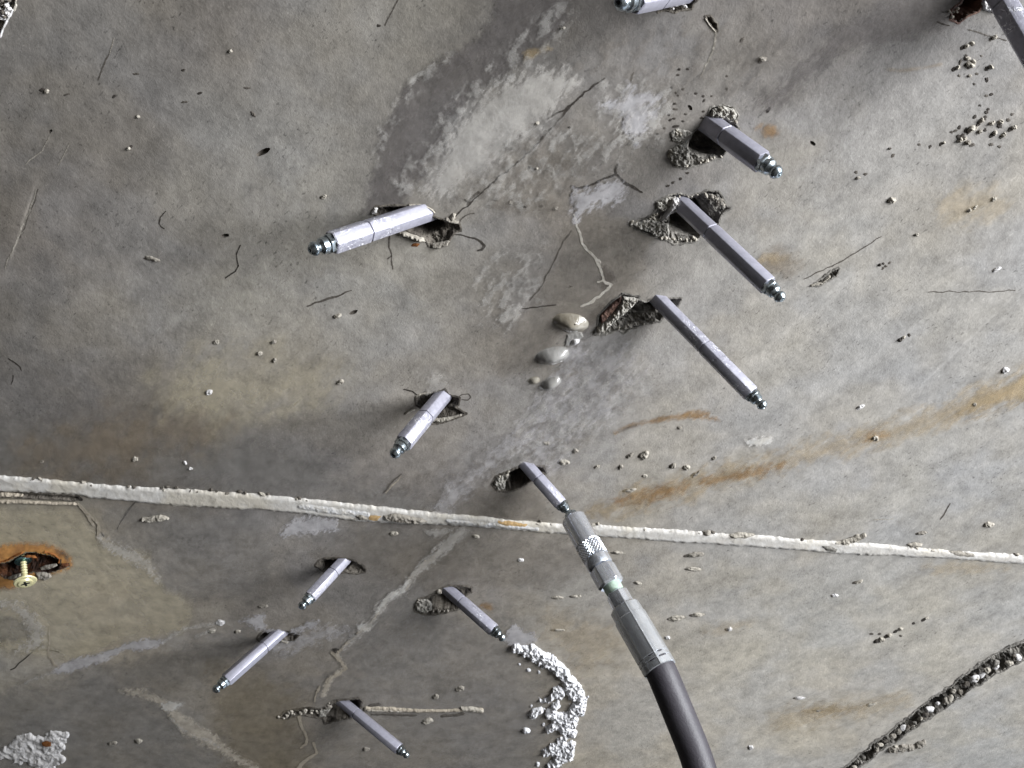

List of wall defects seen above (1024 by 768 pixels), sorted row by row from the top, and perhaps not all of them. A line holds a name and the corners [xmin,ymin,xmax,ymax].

damp [368,0,567,209]
crack [455,72,655,251]
damp [602,83,662,145]
spalling [667,104,741,170]
crack [521,164,643,309]
damp [569,182,625,223]
spalling [628,189,732,246]
spalling [592,292,664,336]
spalling [404,388,468,425]
spalling [491,464,547,494]
corrosion [0,544,72,588]